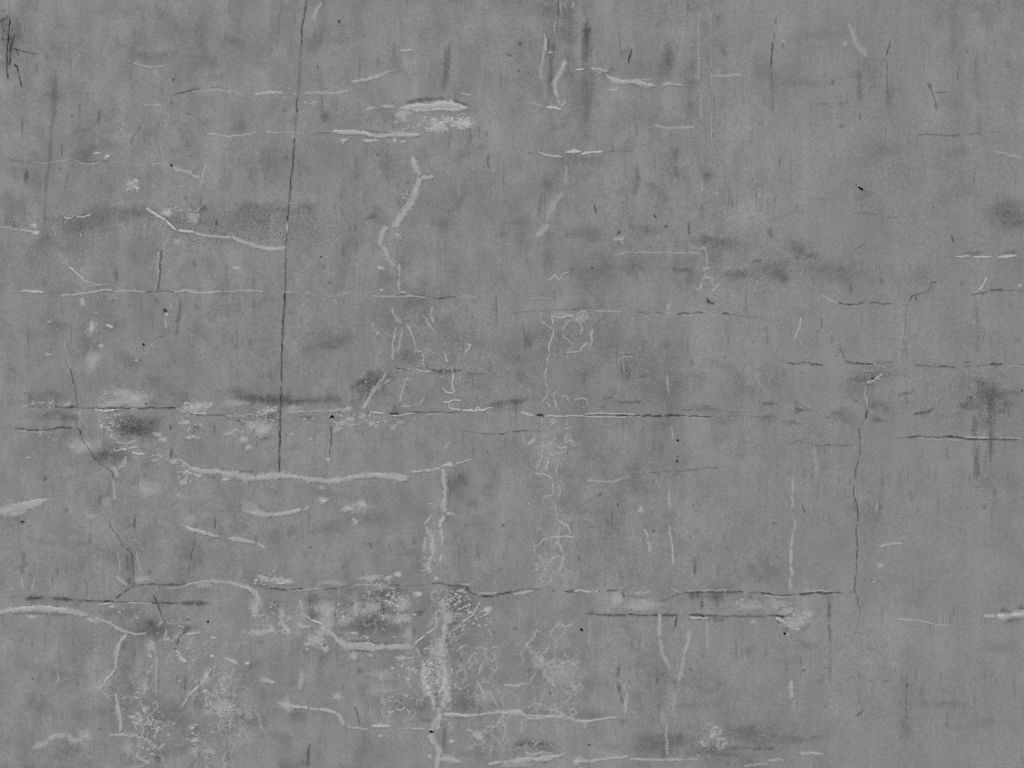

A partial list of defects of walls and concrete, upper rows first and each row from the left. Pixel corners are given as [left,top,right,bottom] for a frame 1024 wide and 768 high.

crack [370,407,492,416]
crack [615,411,713,419]
crack [909,433,1017,441]
crack [438,582,532,597]
crack [566,590,832,626]